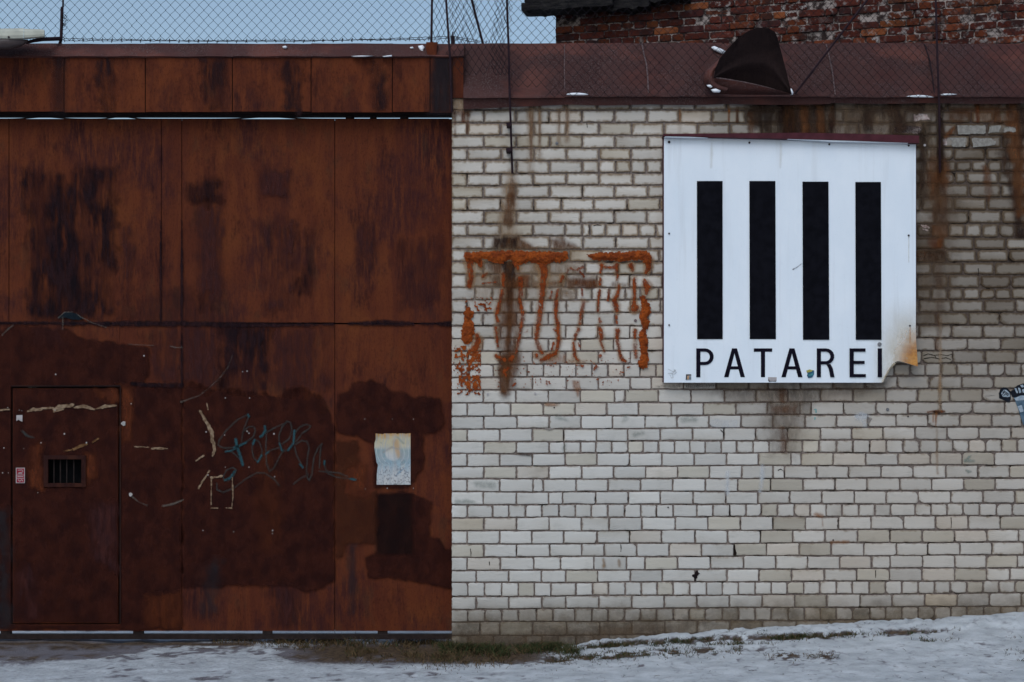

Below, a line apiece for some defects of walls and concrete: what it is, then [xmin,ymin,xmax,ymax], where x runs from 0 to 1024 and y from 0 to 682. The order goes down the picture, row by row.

rust [728,103,941,134]
rust [21,166,115,319]
rust [453,171,653,396]
rust [95,388,133,441]